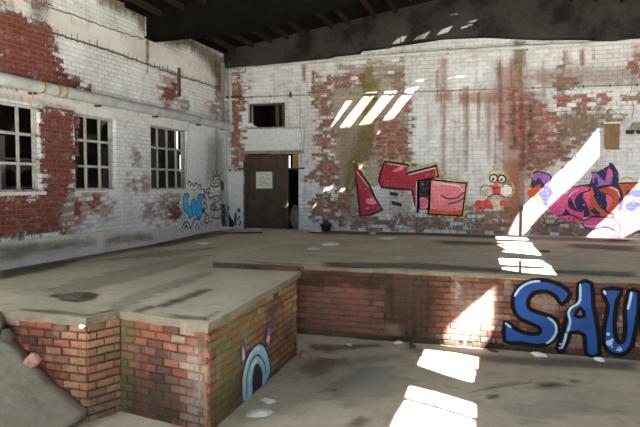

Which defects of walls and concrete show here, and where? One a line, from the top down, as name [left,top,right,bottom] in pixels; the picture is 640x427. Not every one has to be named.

peeling [0,0,92,92]
peeling [0,105,115,242]
peeling [158,76,189,111]
peeling [209,69,251,173]
peeling [304,60,512,234]
peeling [550,61,640,161]
peeling [626,54,640,77]